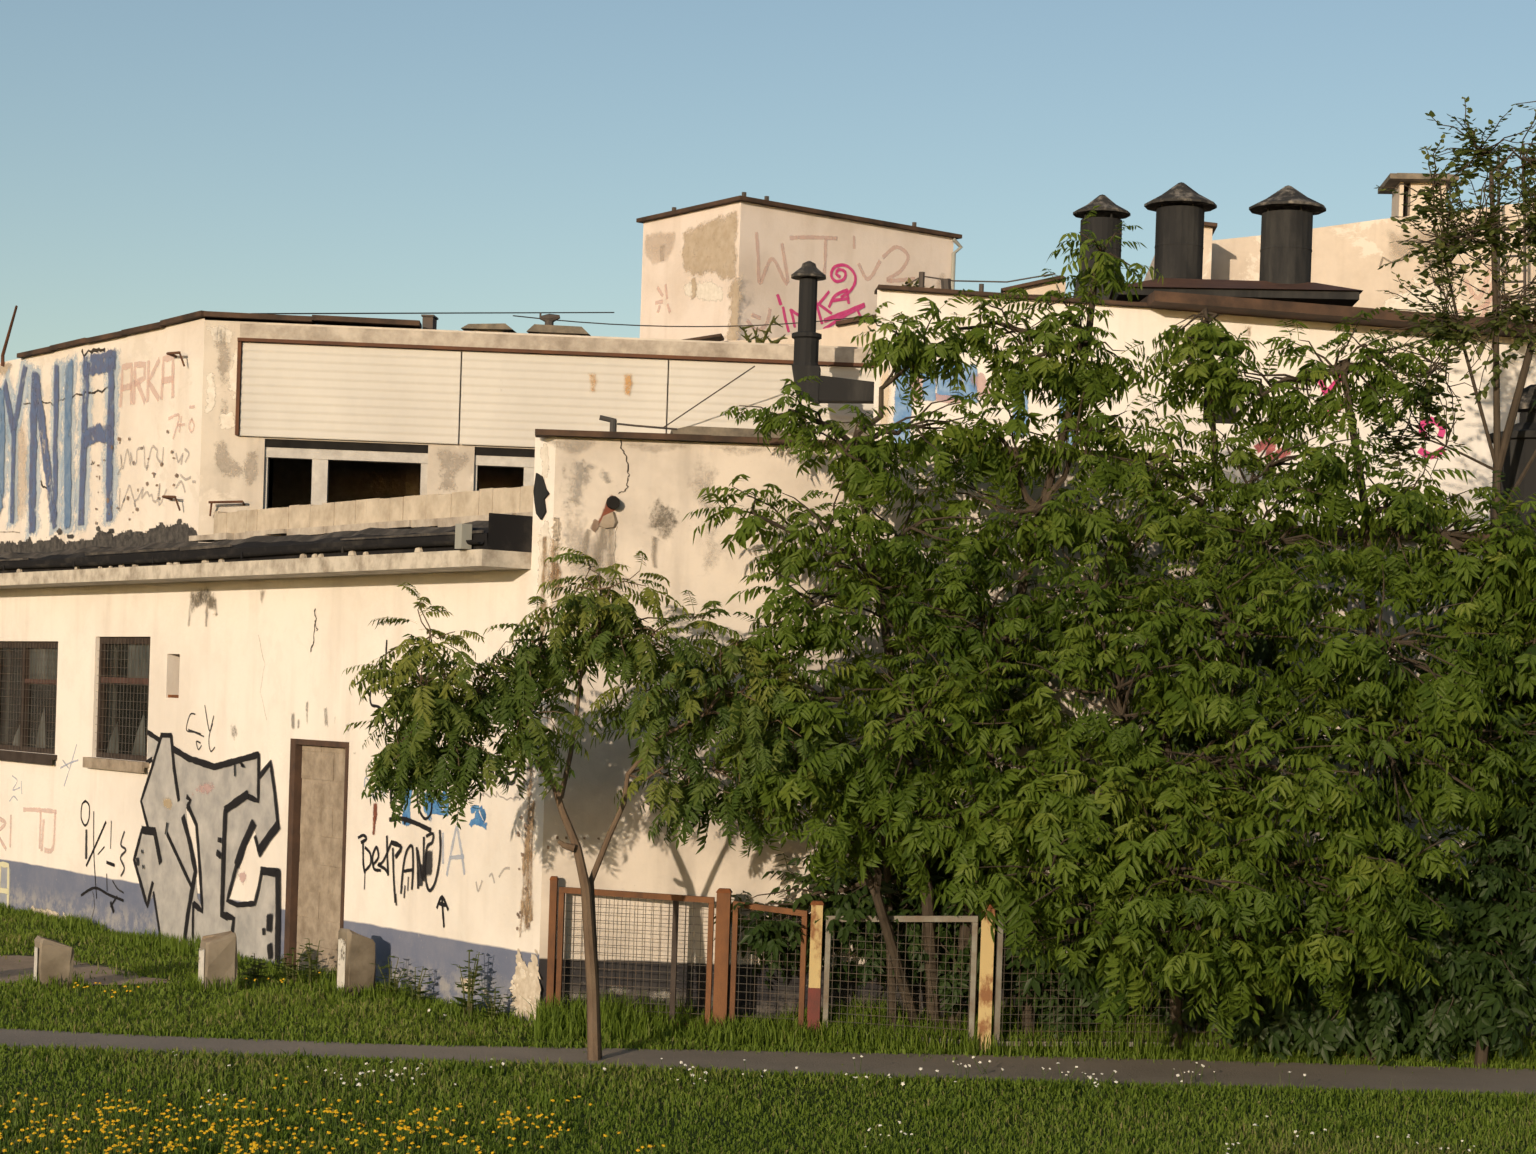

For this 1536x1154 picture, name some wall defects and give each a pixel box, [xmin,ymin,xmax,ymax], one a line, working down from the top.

crack [1379,250,1430,267]